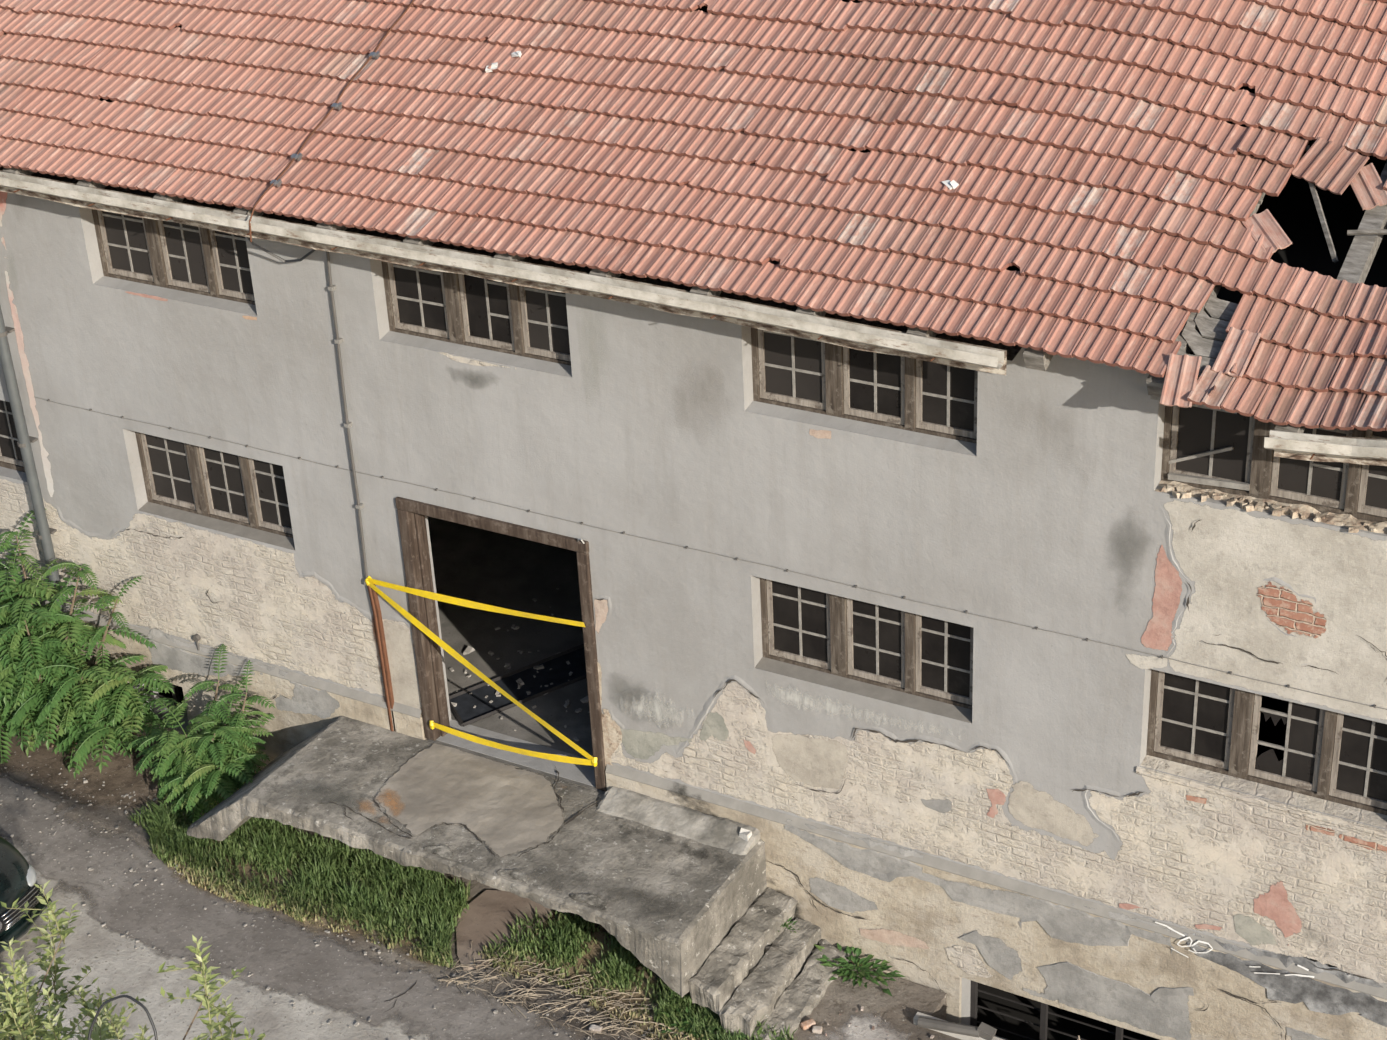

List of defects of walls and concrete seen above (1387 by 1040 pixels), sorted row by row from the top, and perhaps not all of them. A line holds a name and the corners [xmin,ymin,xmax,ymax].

flaking render [0,191,424,724]
flaking render [1126,500,1387,720]
crack [1186,583,1336,673]
crack [319,767,598,882]
flaking render [597,662,1387,1040]